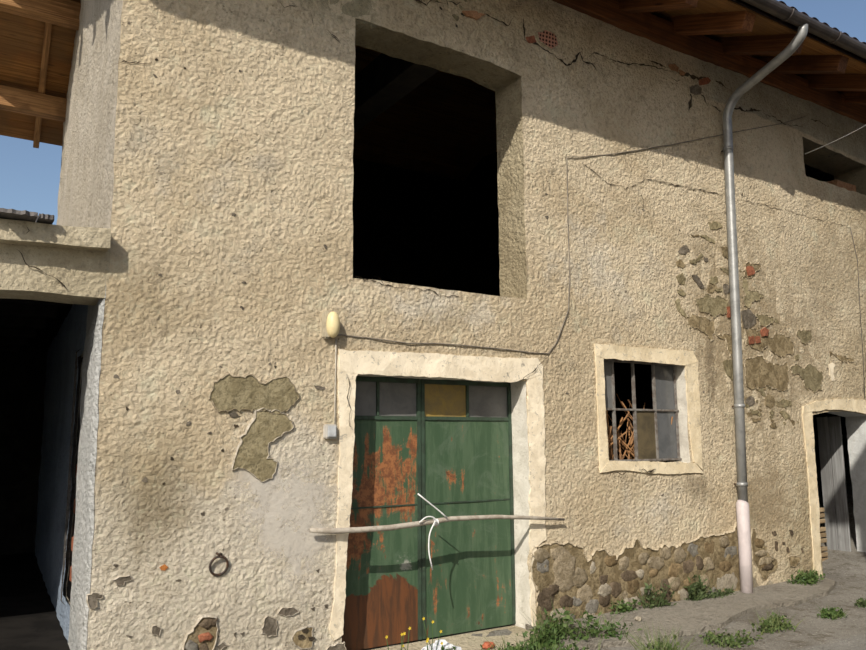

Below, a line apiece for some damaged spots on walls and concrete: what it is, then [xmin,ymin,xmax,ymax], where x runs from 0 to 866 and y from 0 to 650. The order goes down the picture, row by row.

crack [486,14,829,127]
crack [582,163,722,206]
crack [18,227,68,291]
flaking render [675,221,829,439]
flaking render [829,351,854,363]
flaking render [208,362,300,482]
spalling [151,624,162,637]
spalling [182,614,244,650]
spalling [261,606,299,637]
spalling [290,625,315,650]
spalling [325,642,346,650]